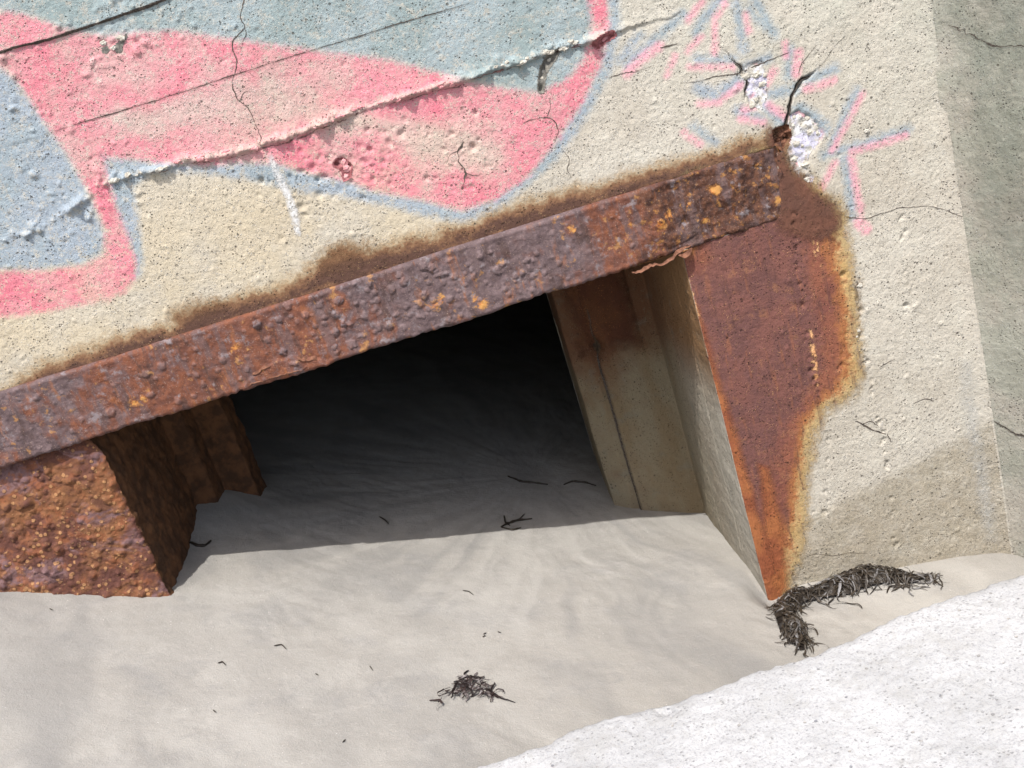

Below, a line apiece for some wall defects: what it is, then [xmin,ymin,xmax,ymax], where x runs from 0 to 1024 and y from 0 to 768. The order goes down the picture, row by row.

crack [0,0,166,54]
crack [56,0,581,184]
spalling [740,61,767,110]
crack [689,36,845,125]
crack [447,142,480,193]
spalling [772,110,822,182]
crack [845,206,963,219]
rust [0,127,865,601]